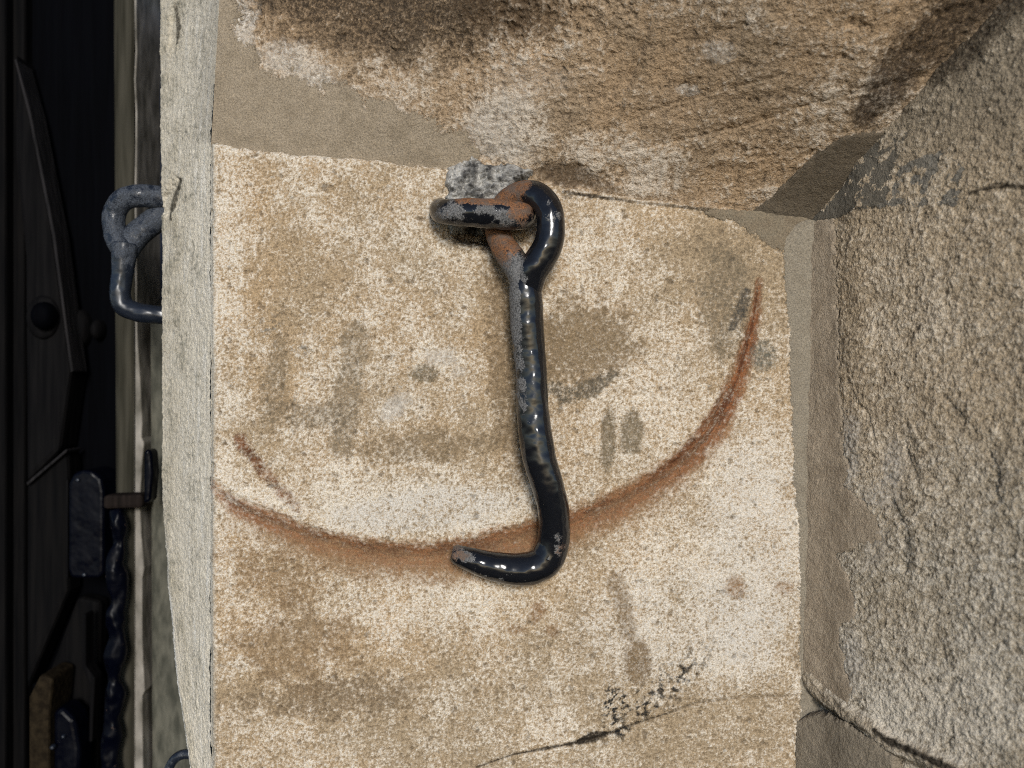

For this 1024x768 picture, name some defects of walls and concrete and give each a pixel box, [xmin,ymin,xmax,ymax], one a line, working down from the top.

rust [568,278,761,550]
rust [234,434,291,503]
rust [218,492,539,582]
crack [476,714,665,767]
crack [817,700,955,768]